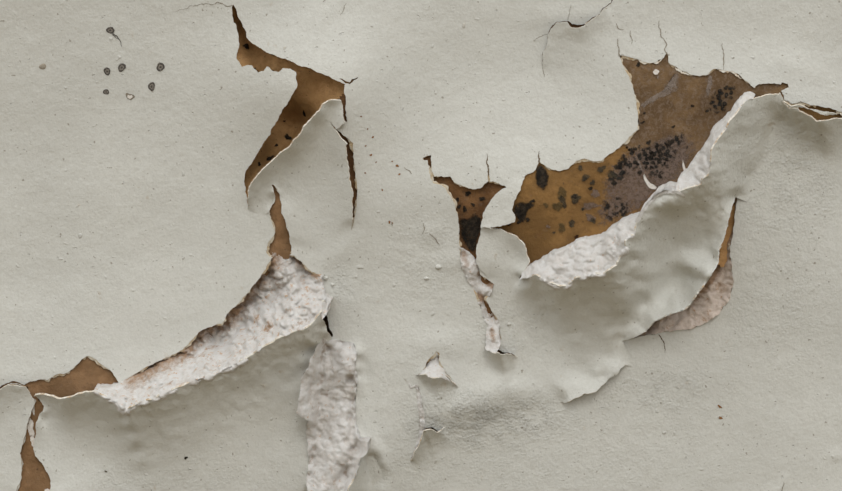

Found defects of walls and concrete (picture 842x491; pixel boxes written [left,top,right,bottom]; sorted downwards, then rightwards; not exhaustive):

water stain [705,75,735,114]
peeling [0,5,400,491]
water stain [507,125,693,226]
peeling [423,54,842,403]
peeling [406,351,463,491]